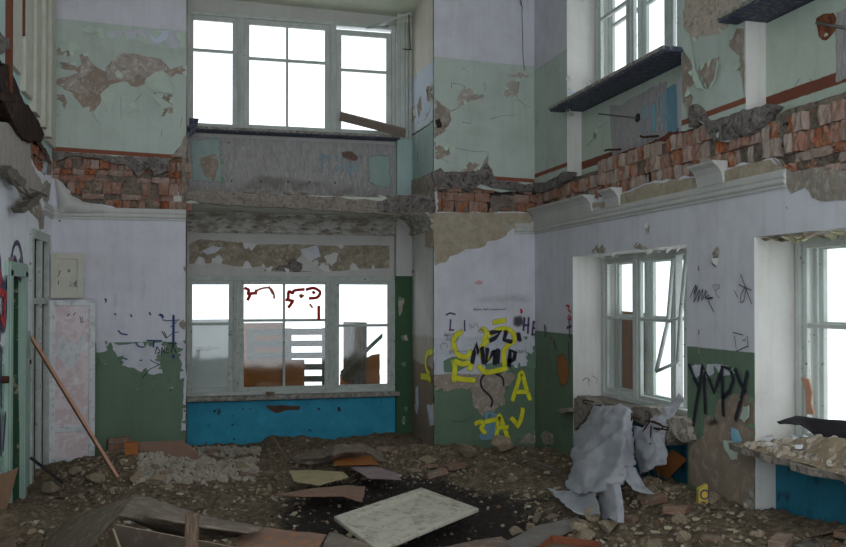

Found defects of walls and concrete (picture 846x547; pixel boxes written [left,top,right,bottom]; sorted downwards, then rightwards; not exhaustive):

peeling [816,8,846,82]
flaking render [0,25,846,268]
peeling [183,239,390,275]
peeling [95,340,187,434]
peeling [267,405,300,413]
peeling [401,386,434,426]
peeling [433,336,536,418]
spalling [583,396,669,445]
peeling [689,363,735,381]
peeling [689,393,756,510]